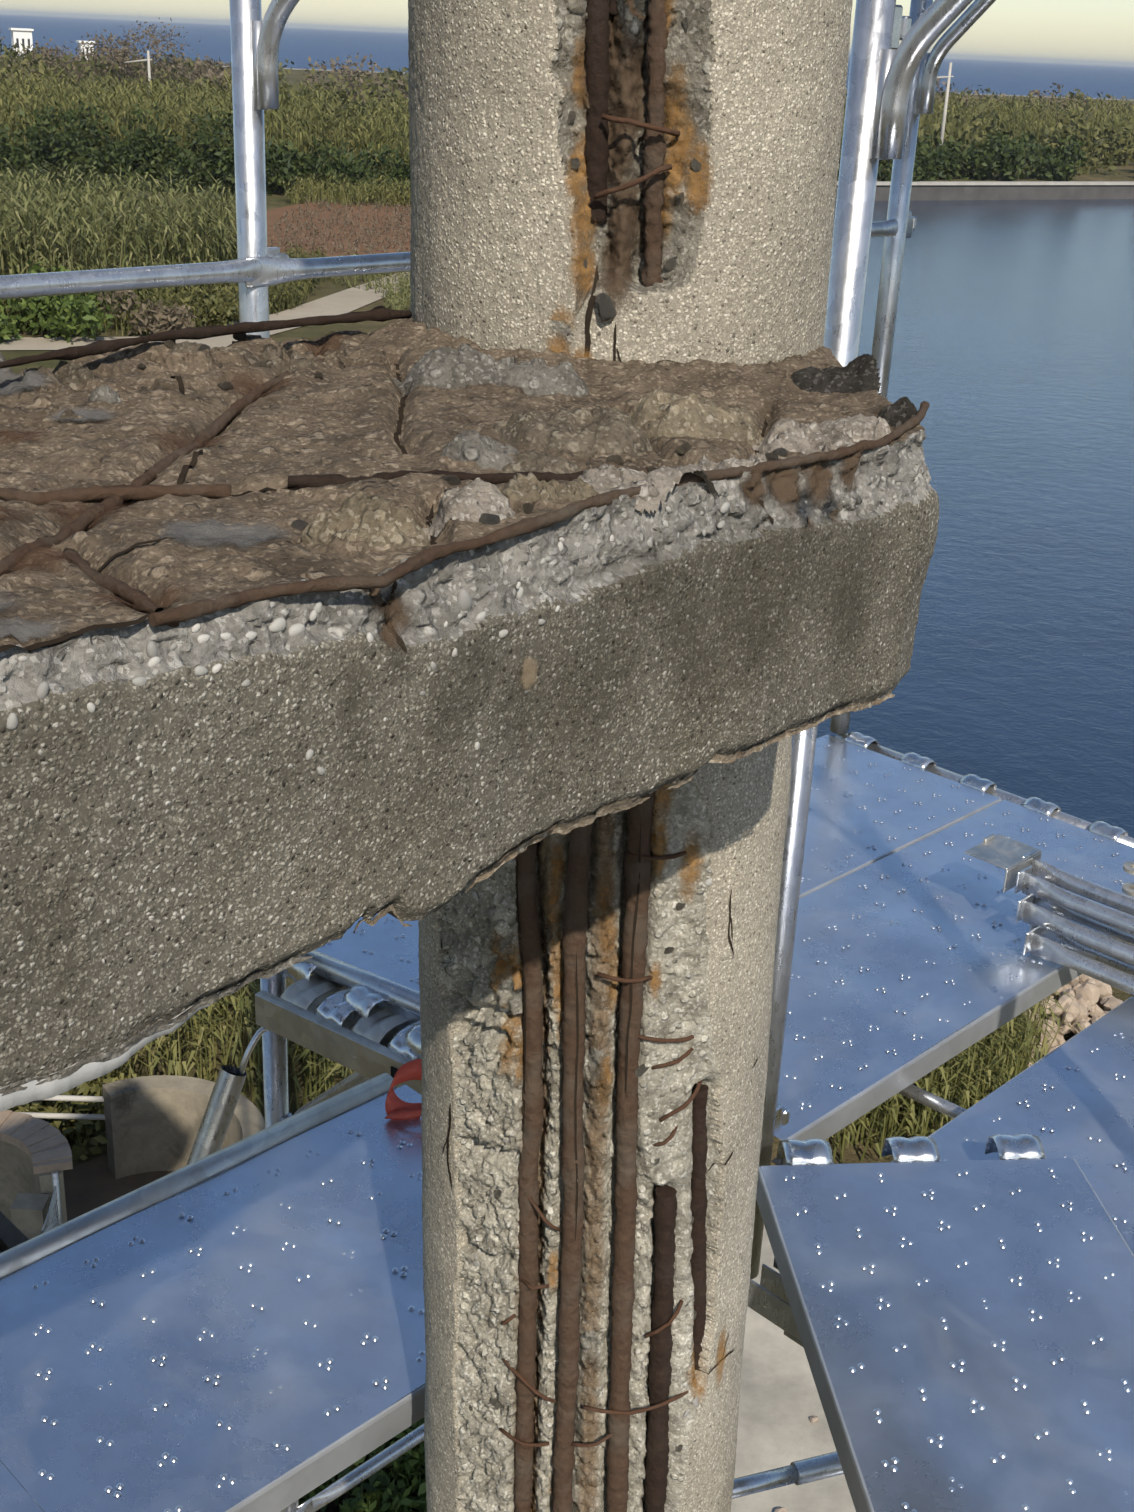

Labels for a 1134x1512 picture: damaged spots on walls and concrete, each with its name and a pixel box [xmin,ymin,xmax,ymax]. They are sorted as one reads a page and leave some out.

spalling [549,0,714,322]
corrosion [567,0,709,301]
crack [0,537,184,652]
crack [37,376,278,539]
crack [231,487,308,497]
crack [368,581,407,652]
spalling [0,430,937,730]
corrosion [741,452,862,525]
spalling [305,749,325,776]
corrosion [537,1090,557,1320]
corrosion [585,814,618,1331]
spalling [435,693,895,1512]